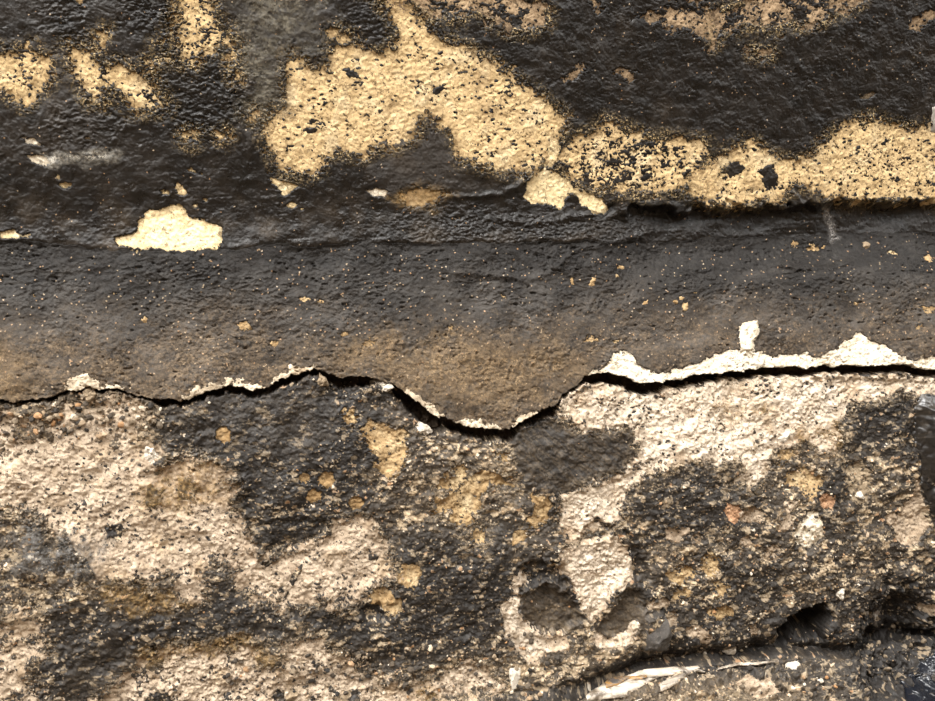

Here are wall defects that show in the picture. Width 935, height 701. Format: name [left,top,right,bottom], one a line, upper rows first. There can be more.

peeling [0,0,248,120]
peeling [179,120,237,154]
peeling [242,0,935,218]
peeling [115,182,223,254]
crack [0,360,935,442]
spalling [512,320,935,651]